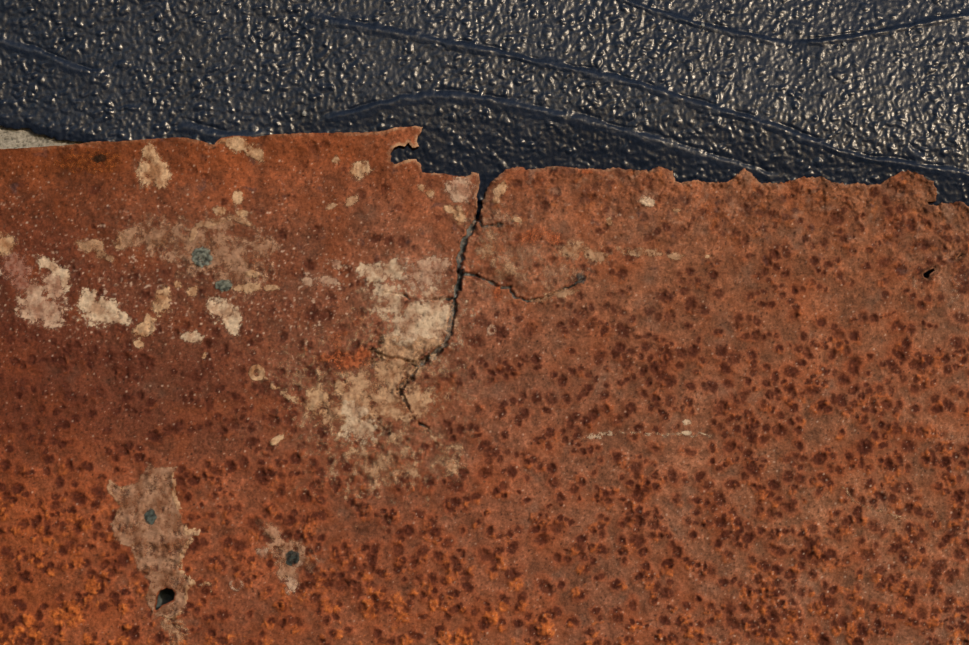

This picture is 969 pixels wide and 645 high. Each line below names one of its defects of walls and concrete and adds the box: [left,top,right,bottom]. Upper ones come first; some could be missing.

corrosion [70,152,119,173]
peeling [135,144,172,190]
peeling [90,215,280,294]
corrosion [320,346,371,369]
crack [397,219,580,427]
peeling [107,463,212,642]
peeling [257,523,310,594]
corrosion [156,588,175,610]